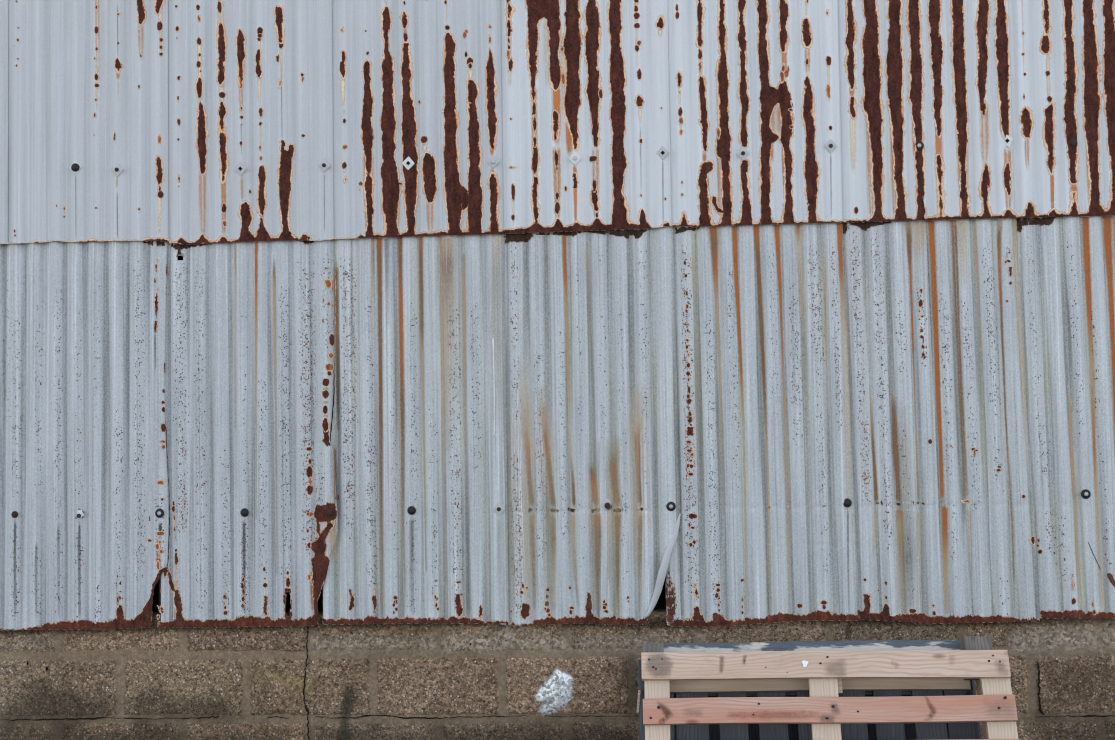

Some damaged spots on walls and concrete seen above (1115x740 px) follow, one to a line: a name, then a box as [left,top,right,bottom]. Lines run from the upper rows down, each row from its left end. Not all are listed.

corrosion [0,0,1115,589]
corrosion [666,399,1115,626]
crack [268,627,638,740]